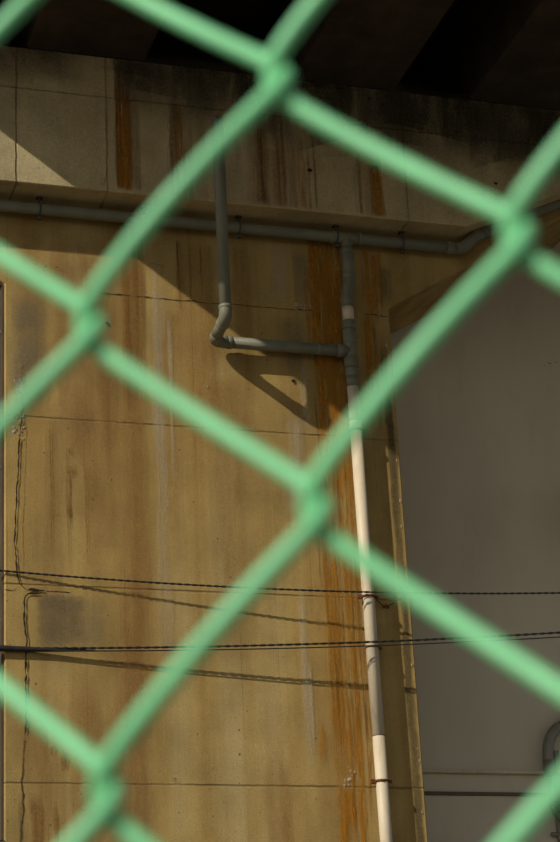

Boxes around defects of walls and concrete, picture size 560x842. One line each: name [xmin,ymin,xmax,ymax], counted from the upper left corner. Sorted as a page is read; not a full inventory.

crack [5,417,70,694]
crack [19,718,27,842]
rust [323,547,371,842]